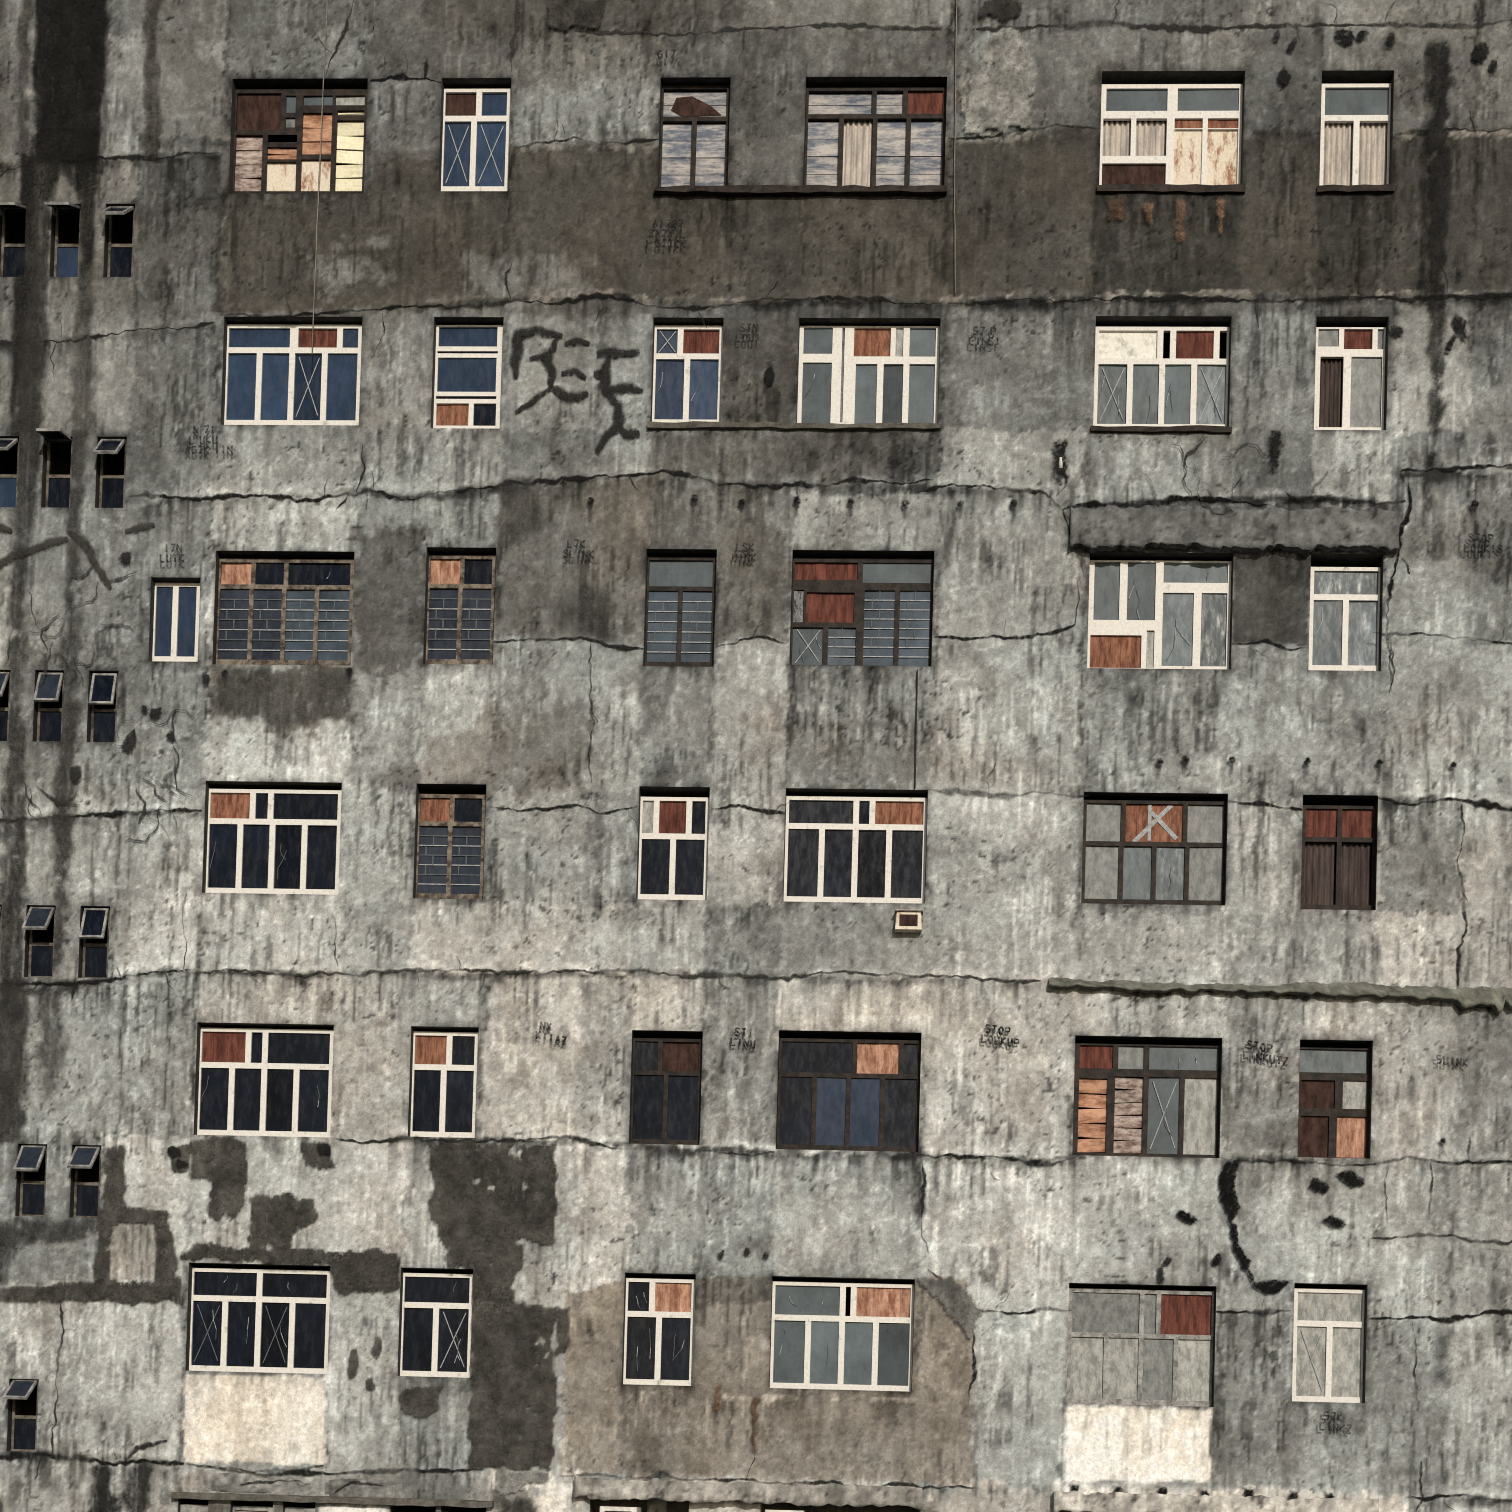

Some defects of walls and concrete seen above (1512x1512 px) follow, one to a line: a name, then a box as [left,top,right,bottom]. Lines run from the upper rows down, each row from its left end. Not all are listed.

water stain [143,0,162,155]
corrosion [1176,199,1186,240]
water stain [1418,41,1457,463]
water stain [0,0,108,1143]
crack [0,260,1512,693]